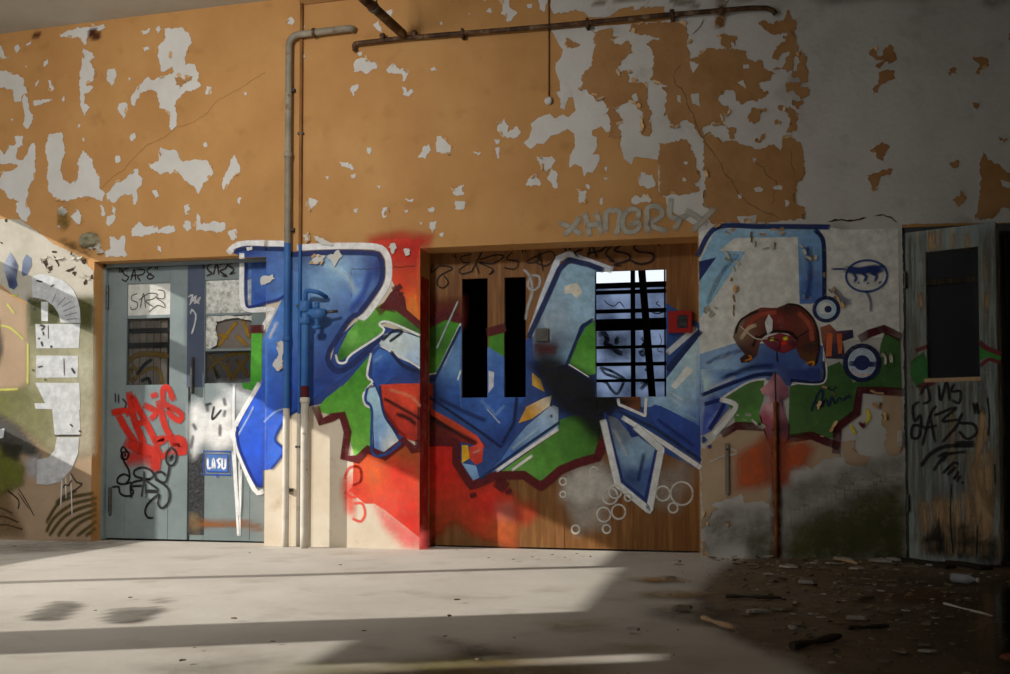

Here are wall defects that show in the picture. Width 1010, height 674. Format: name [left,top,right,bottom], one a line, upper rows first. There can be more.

peeling [484,0,517,22]
peeling [418,136,452,159]
peeling [0,23,241,335]
peeling [450,184,466,210]
crack [673,64,844,317]
peeling [494,0,1010,560]
peeling [273,341,283,371]
crack [880,351,893,364]
crack [736,413,766,429]
crack [817,386,838,437]
crack [870,390,887,420]